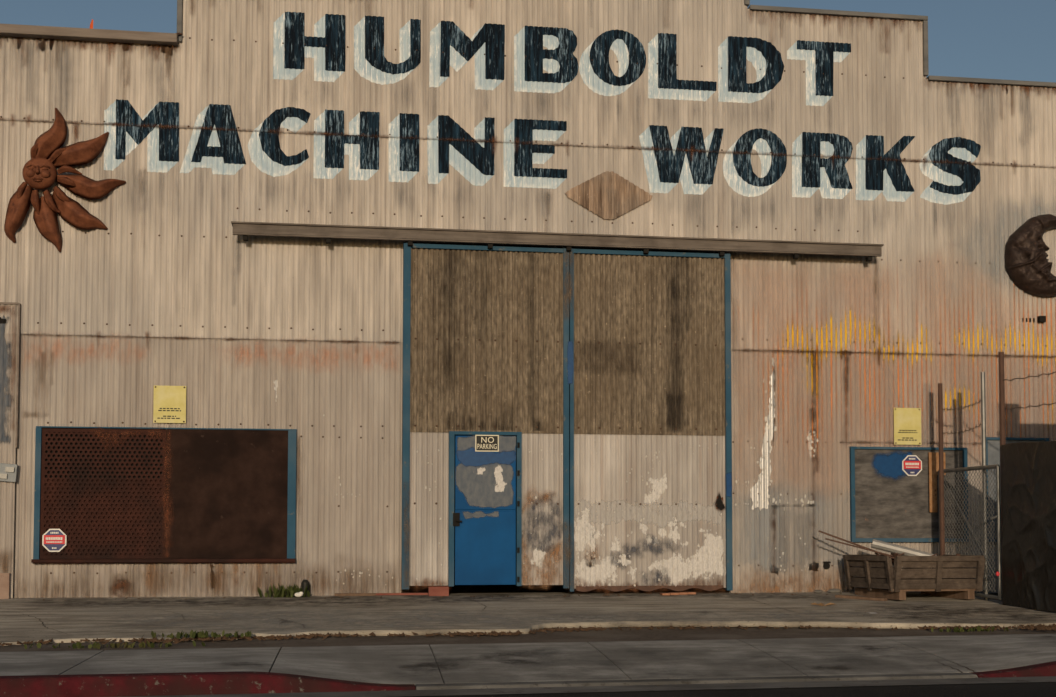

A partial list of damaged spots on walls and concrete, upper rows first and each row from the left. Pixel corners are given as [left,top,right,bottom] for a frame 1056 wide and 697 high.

peeling [574,473,726,587]
peeling [735,358,819,571]